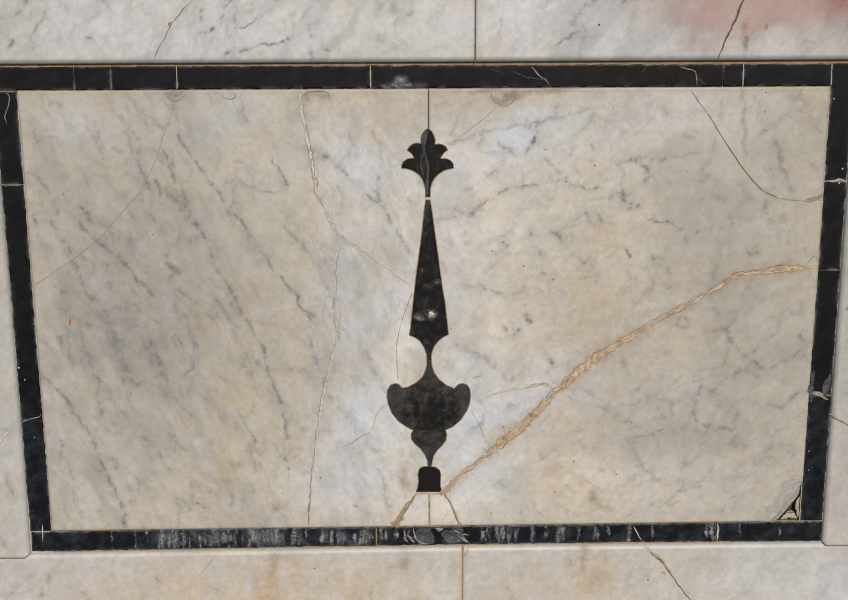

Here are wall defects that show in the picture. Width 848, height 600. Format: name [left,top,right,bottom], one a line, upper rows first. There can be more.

crack [718,0,744,59]
crack [682,67,845,203]
crack [298,93,412,525]
crack [391,256,814,528]
crack [634,527,691,600]
spalling [762,479,803,521]